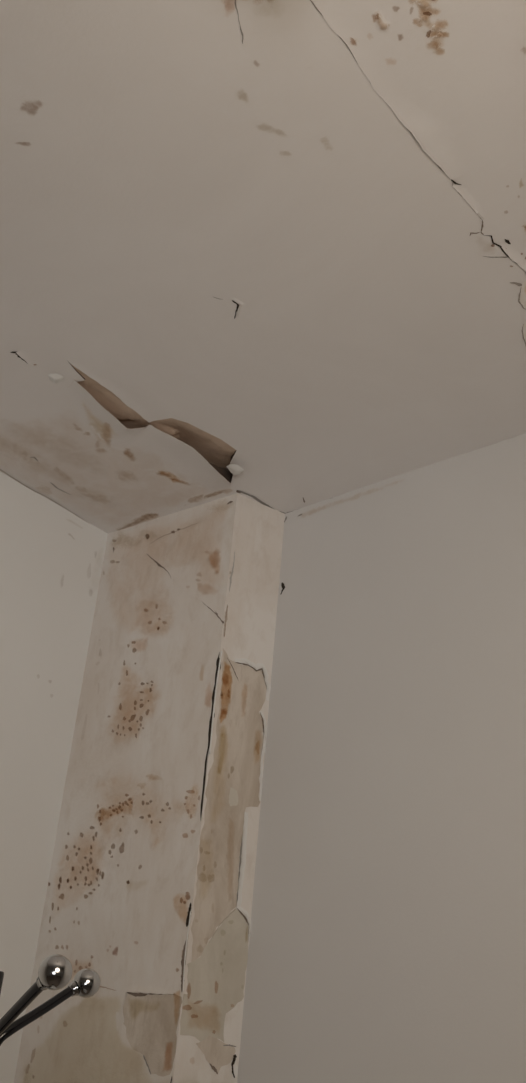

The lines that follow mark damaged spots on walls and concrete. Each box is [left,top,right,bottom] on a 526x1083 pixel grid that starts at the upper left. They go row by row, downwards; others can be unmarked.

crack [470,232,526,272]
peeling [47,356,244,492]
crack [147,523,197,577]
crack [200,552,235,817]
peeling [120,649,271,1077]
crack [181,903,192,992]